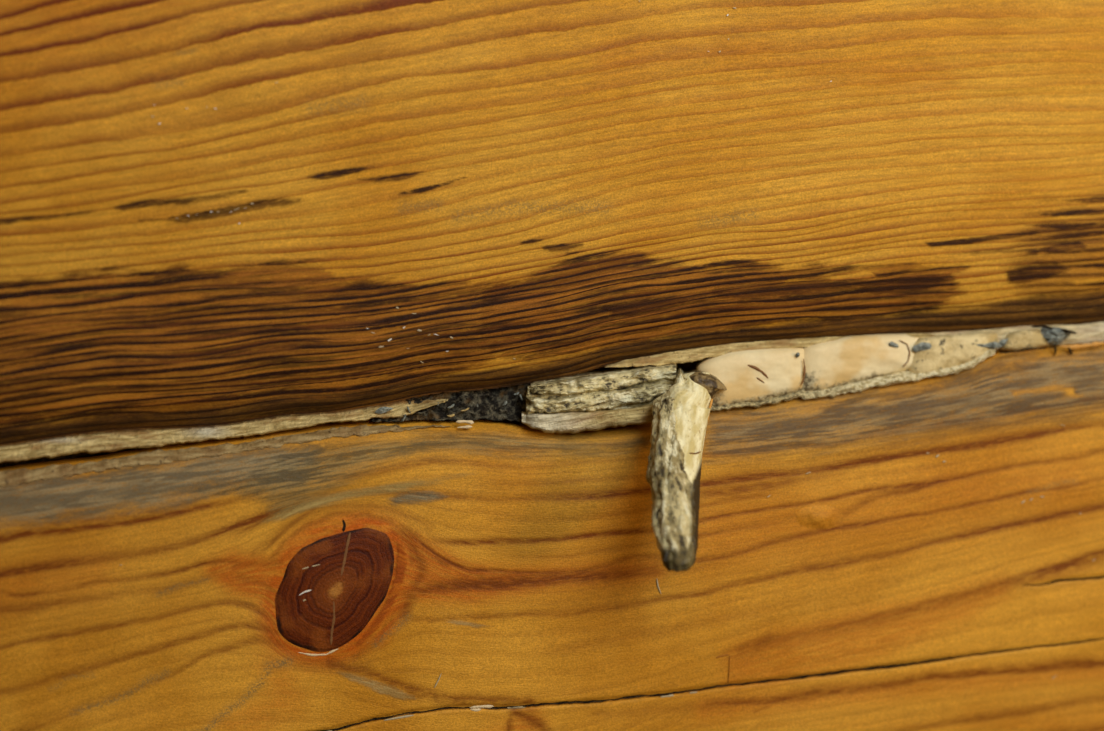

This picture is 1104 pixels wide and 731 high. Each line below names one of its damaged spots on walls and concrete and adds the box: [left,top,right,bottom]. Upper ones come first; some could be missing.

crack [1025,576,1104,586]
crack [320,638,1104,731]